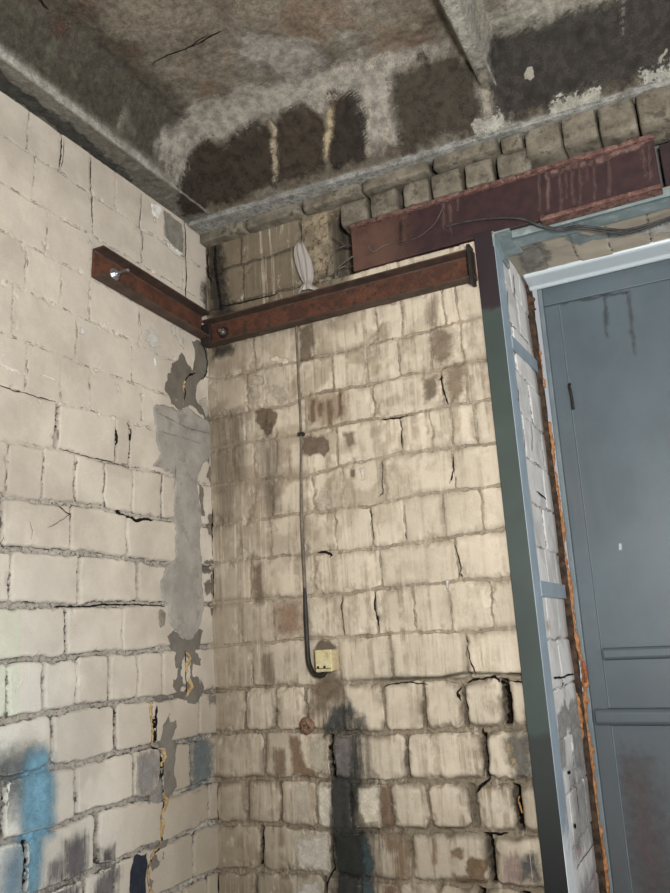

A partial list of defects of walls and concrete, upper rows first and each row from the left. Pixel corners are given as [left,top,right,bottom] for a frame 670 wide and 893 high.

crack [152,30,223,65]
damp [154,0,670,217]
peeling [524,66,534,80]
rust [538,142,645,210]
flaking render [165,340,210,422]
peeling [199,457,212,535]
peeling [202,559,214,615]
damp [315,641,336,650]
crack [147,702,169,893]
damp [273,737,359,835]
crack [476,728,491,793]
damp [379,786,410,893]